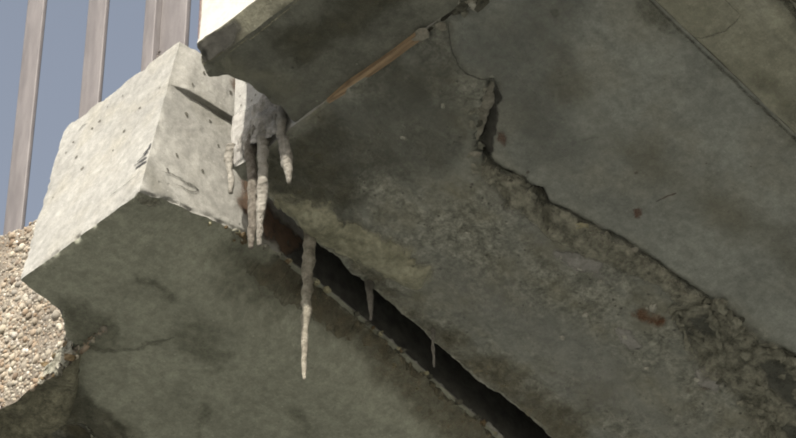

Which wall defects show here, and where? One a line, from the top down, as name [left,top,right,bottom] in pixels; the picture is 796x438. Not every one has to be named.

water stain [224,94,355,249]